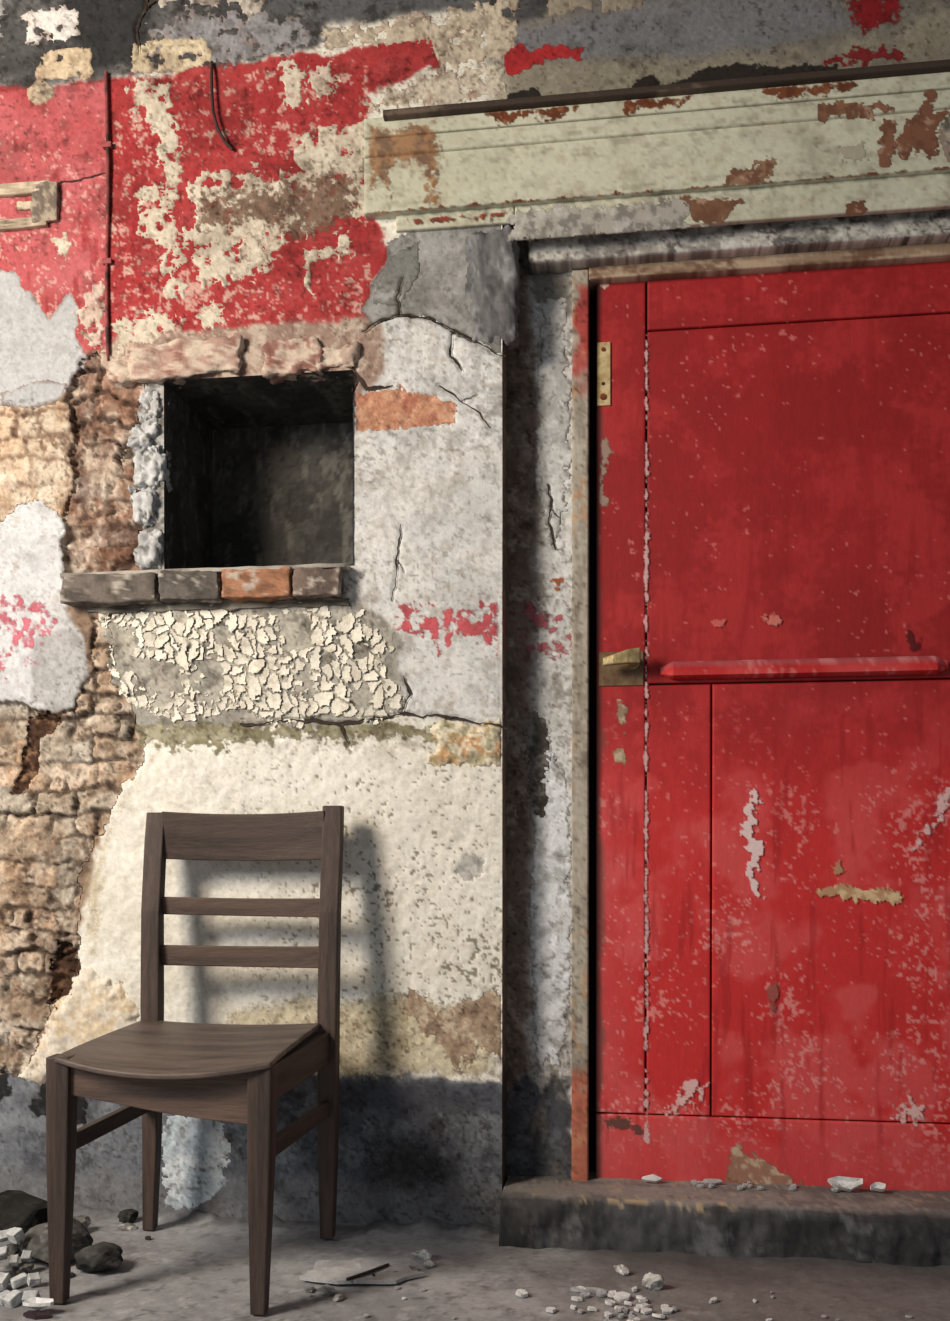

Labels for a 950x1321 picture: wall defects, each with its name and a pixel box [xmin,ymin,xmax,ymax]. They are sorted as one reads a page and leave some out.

peeling [824,0,906,67]
peeling [818,89,950,168]
flaking render [0,0,585,573]
crack [351,367,393,391]
crack [362,276,506,428]
crack [240,676,507,745]
flaking render [0,594,503,1076]
peeling [739,789,764,899]
peeling [816,860,903,906]
water stain [231,993,317,1025]
water stain [339,994,493,1078]
peeling [691,1144,803,1191]